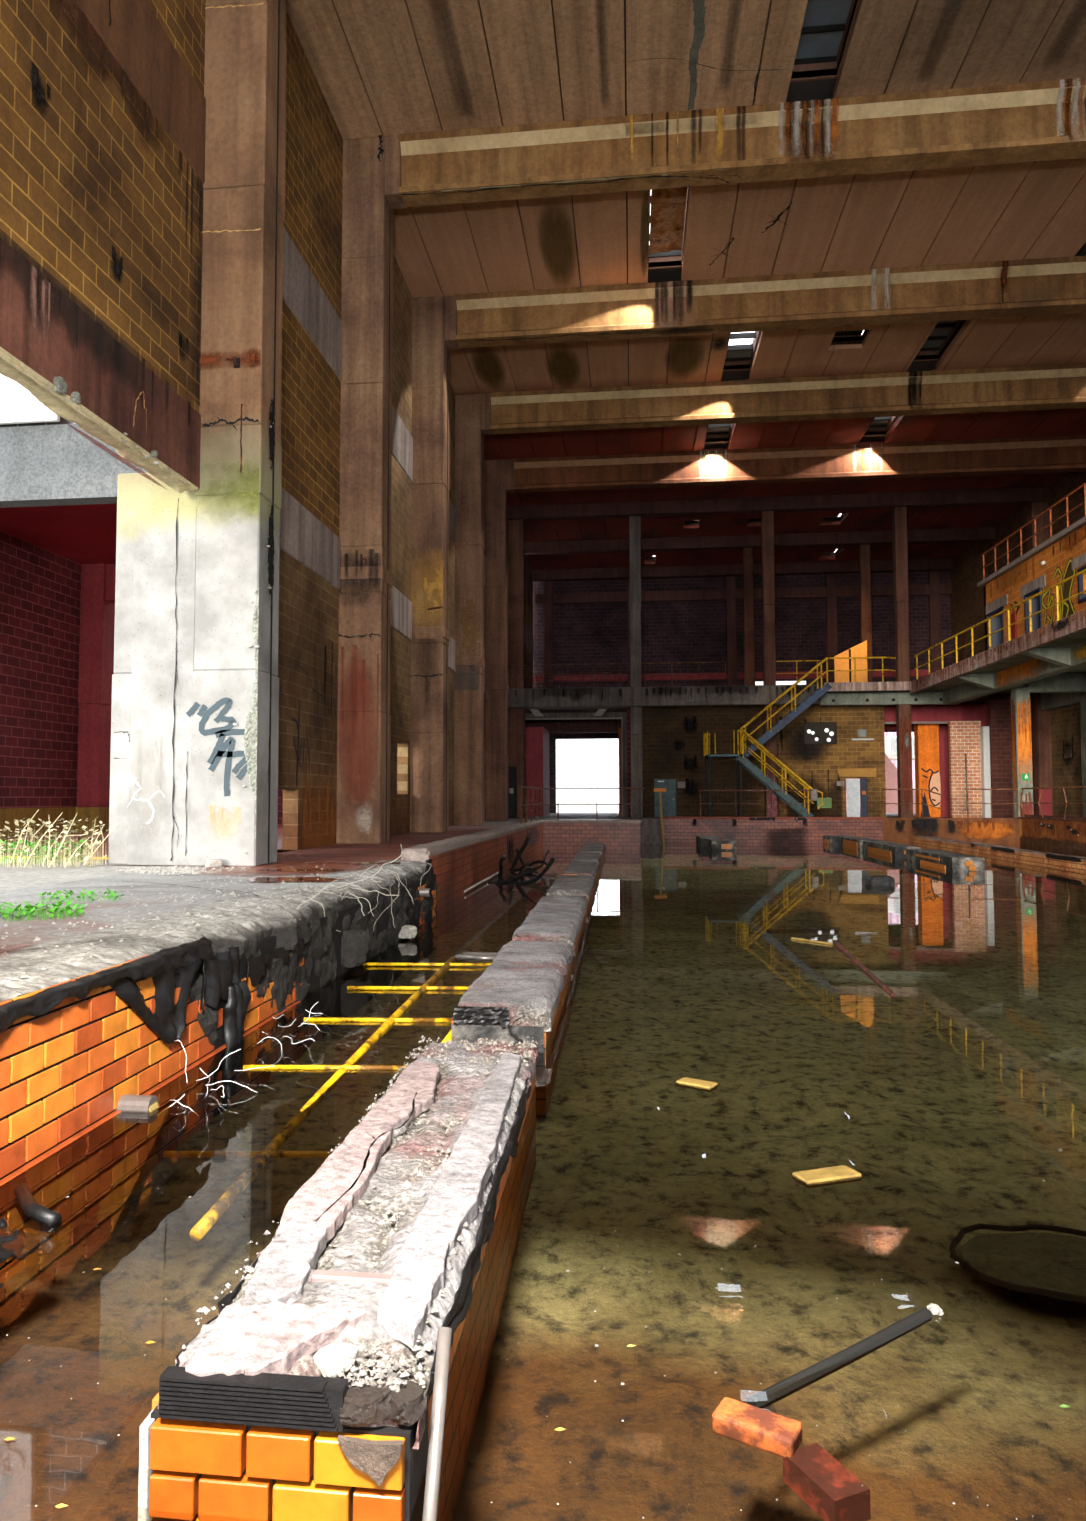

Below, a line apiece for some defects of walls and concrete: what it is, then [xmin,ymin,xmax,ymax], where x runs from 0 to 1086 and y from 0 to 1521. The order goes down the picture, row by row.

leakage [542,208,573,281]
leakage [0,231,169,405]
leakage [641,200,704,377]
rust [200,350,261,367]
leakage [474,349,503,386]
leakage [549,348,578,384]
crack [201,417,260,435]
rust [911,610,1086,845]
spalling [0,860,438,1052]
spalling [338,1375,427,1427]